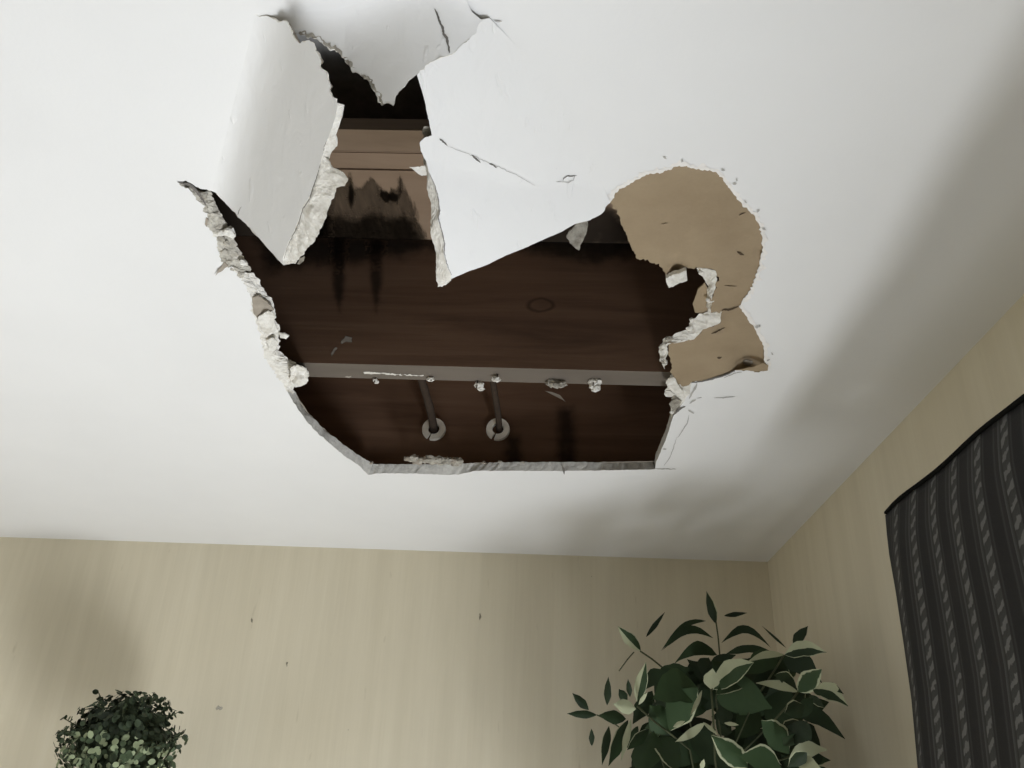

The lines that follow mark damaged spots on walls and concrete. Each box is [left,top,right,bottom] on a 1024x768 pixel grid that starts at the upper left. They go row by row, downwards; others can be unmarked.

spalling [257,15,345,164]
peeling [410,157,429,176]
crack [440,139,577,186]
spalling [179,179,316,394]
water stain [202,177,433,300]
water stain [525,209,634,262]
peeling [607,157,773,416]
crack [655,372,741,470]